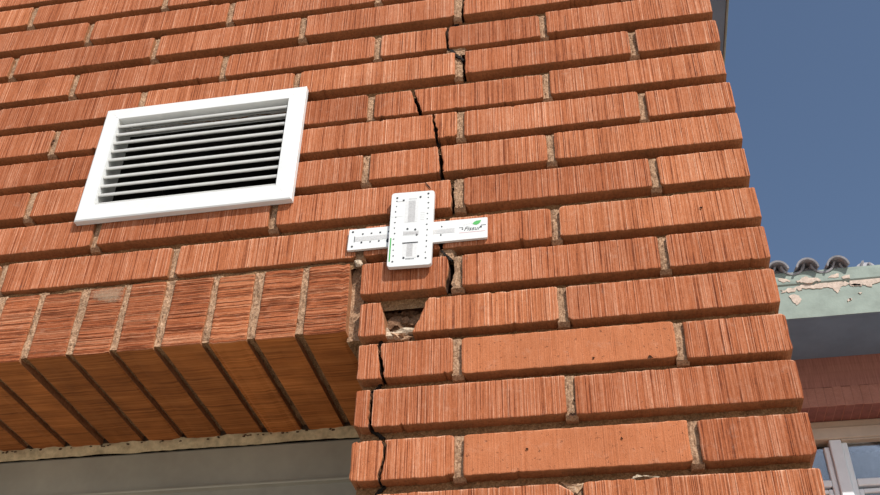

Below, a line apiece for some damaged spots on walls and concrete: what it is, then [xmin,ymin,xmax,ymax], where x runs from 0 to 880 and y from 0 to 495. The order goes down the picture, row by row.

crack [445,2,467,82]
crack [412,92,455,214]
spalling [386,311,422,342]
crack [439,243,455,295]
peeling [778,273,880,305]
crack [368,341,387,495]